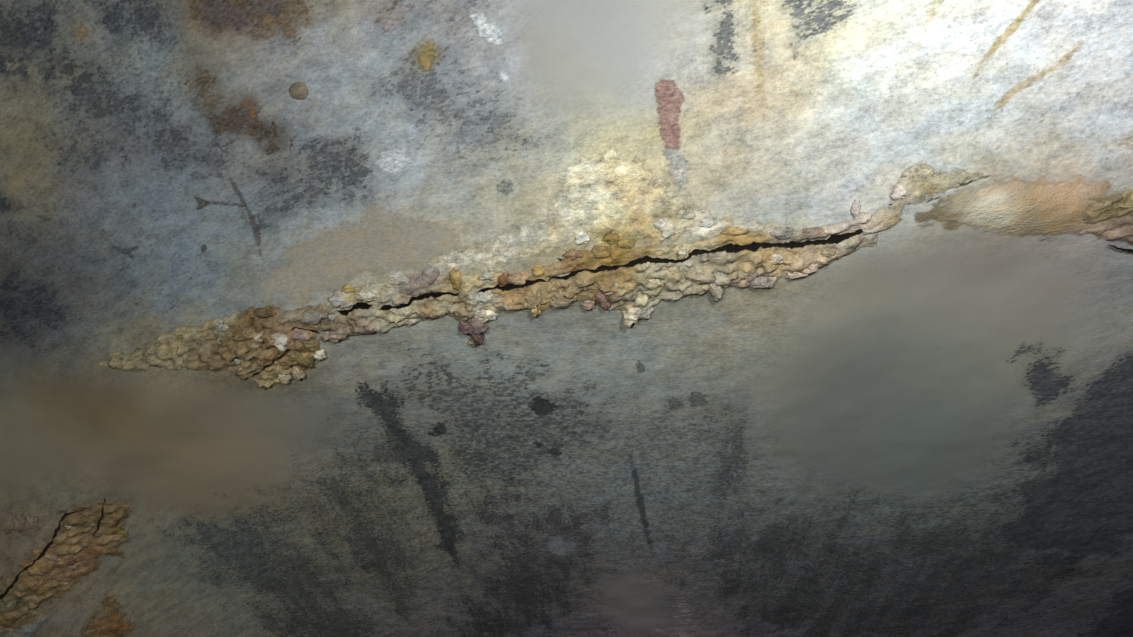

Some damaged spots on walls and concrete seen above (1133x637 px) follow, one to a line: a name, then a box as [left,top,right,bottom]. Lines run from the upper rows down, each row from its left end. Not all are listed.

rust [655,80,685,150]
leakage [704,0,740,75]
leakage [783,0,856,60]
rust [984,0,1039,60]
rust [997,47,1078,107]
crack [337,223,864,315]
spalling [87,163,1133,390]
crack [1107,244,1133,253]
leakage [163,348,614,637]
leakage [665,343,1133,637]
crack [0,498,105,599]
spalling [0,500,135,637]